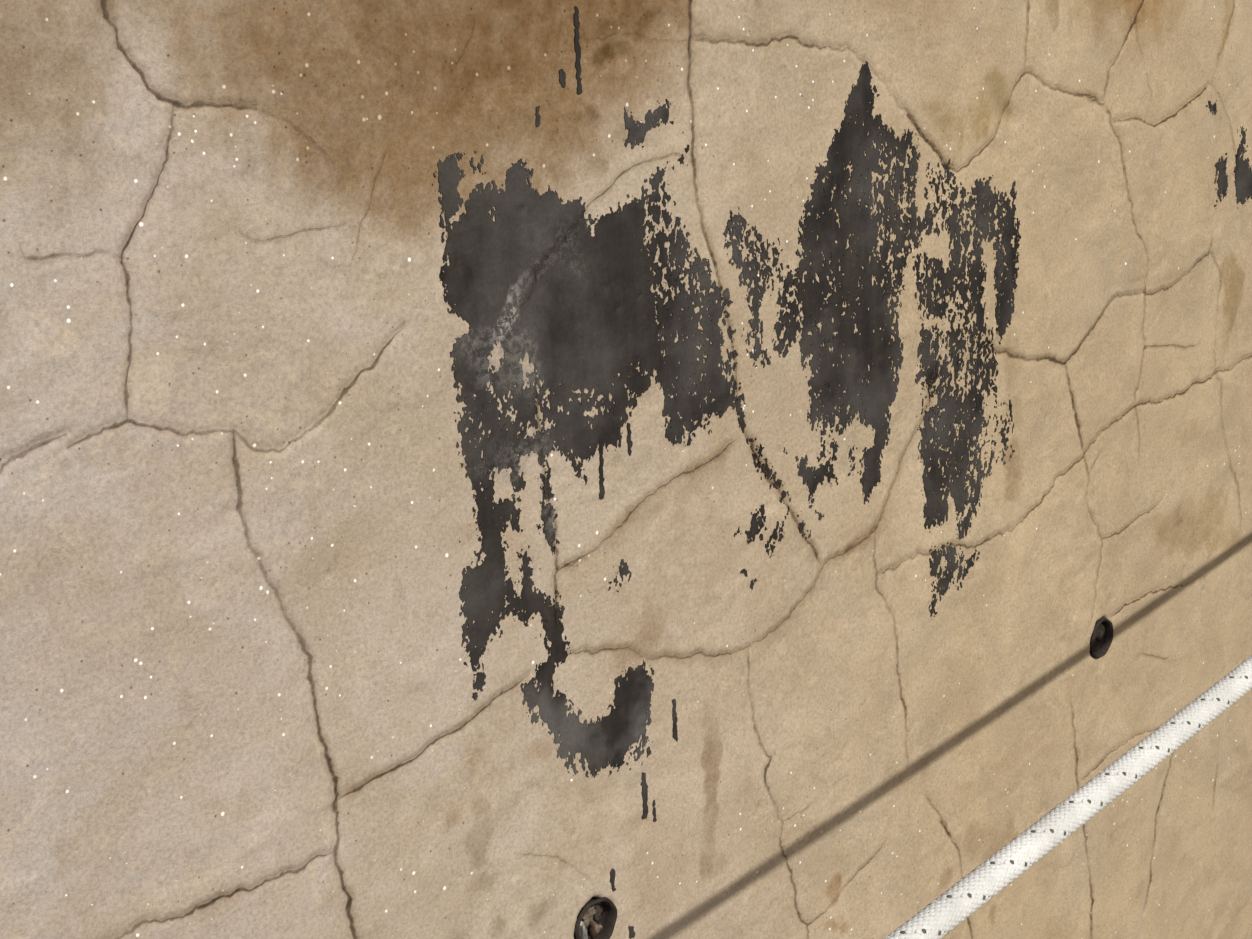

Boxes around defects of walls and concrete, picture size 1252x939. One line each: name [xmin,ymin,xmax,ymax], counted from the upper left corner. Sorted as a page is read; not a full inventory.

crack [121,148,168,301]
crack [102,0,248,108]
crack [688,0,821,190]
crack [907,113,994,171]
crack [1061,75,1207,242]
peeling [1214,126,1252,209]
crack [101,355,168,433]
peeling [432,61,1021,778]
crack [992,314,1103,470]
crack [625,437,836,560]
crack [304,653,515,939]
crack [151,879,268,922]